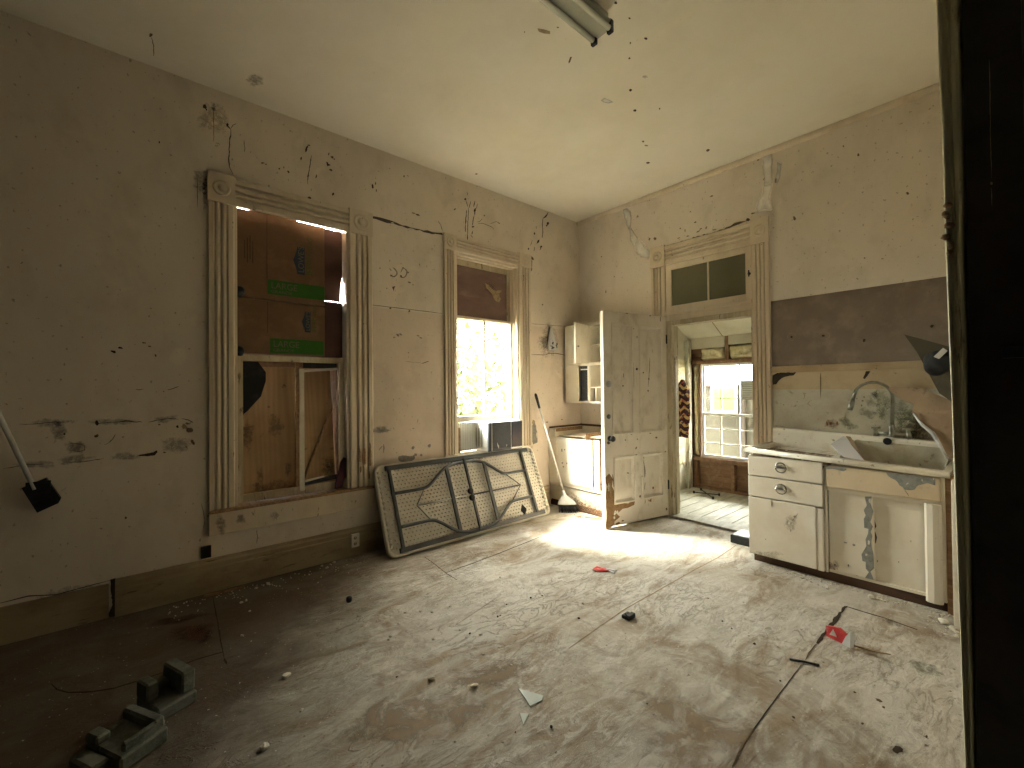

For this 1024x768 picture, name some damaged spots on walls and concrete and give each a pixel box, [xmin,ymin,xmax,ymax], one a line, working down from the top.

crack [226,123,245,170]
peeling [605,474,663,529]